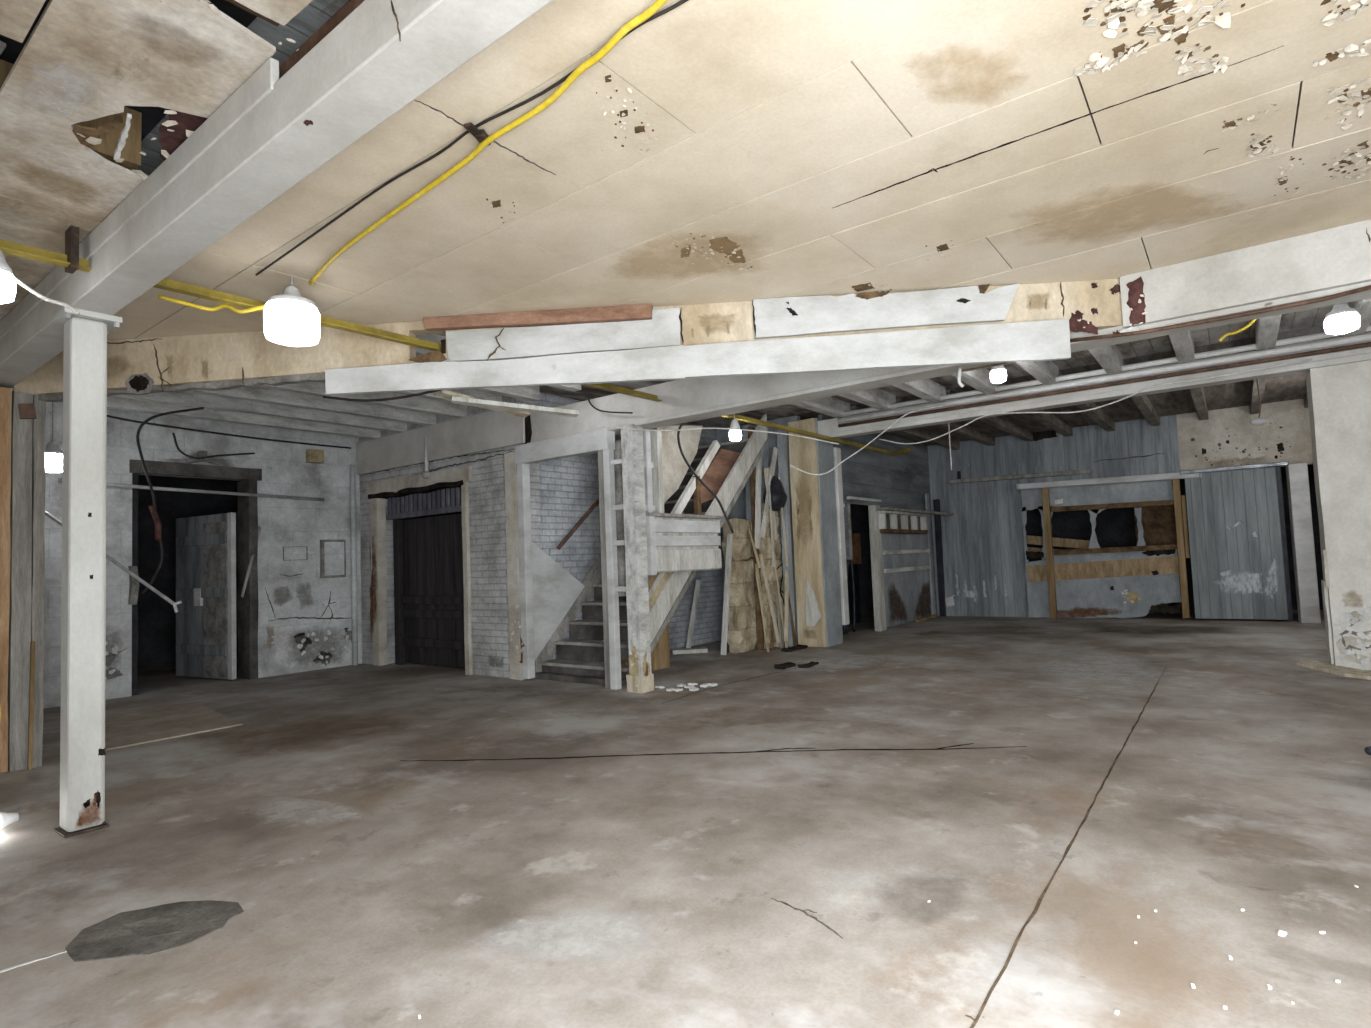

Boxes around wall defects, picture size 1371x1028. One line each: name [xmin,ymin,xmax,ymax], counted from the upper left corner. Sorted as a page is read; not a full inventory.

peeling [1320,0,1371,27]
peeling [1073,0,1245,78]
peeling [1312,39,1371,67]
peeling [1325,78,1371,130]
spalling [72,110,208,180]
peeling [1322,140,1371,182]
crack [487,328,505,361]
spalling [1333,605,1371,666]
crack [400,743,1027,761]
corrosion [77,795,100,825]
crack [965,668,1166,1028]
crack [771,898,843,939]